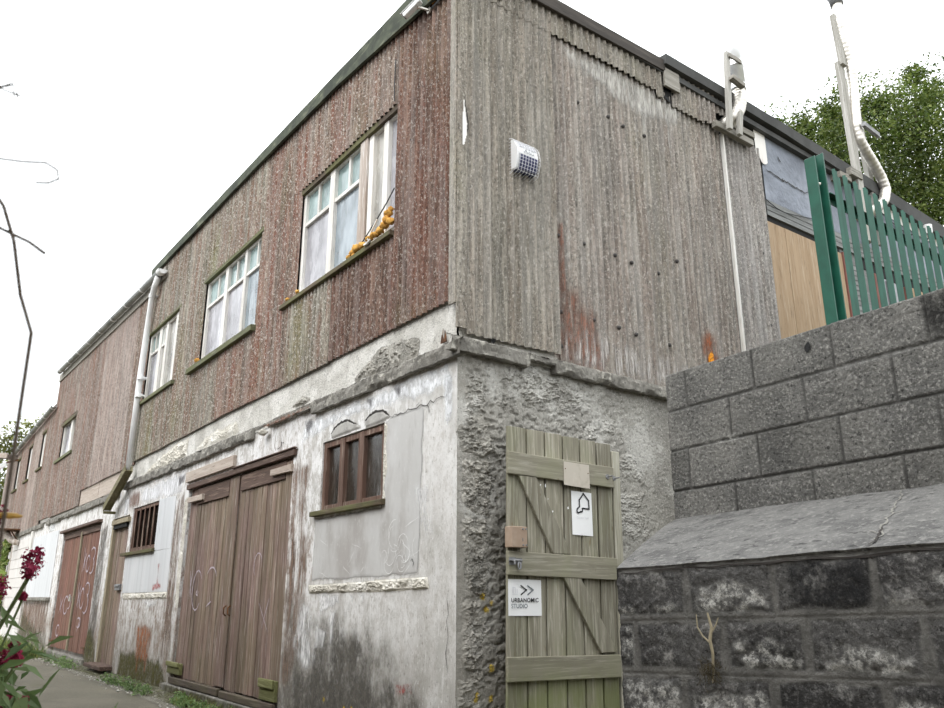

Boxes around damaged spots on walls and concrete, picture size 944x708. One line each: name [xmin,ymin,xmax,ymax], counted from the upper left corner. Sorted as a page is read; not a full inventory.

corrosion [559,226,603,367]
spalling [355,337,420,382]
corrosion [704,334,717,362]
spalling [145,421,239,474]
damp [278,466,418,708]
corrosion [136,626,150,671]